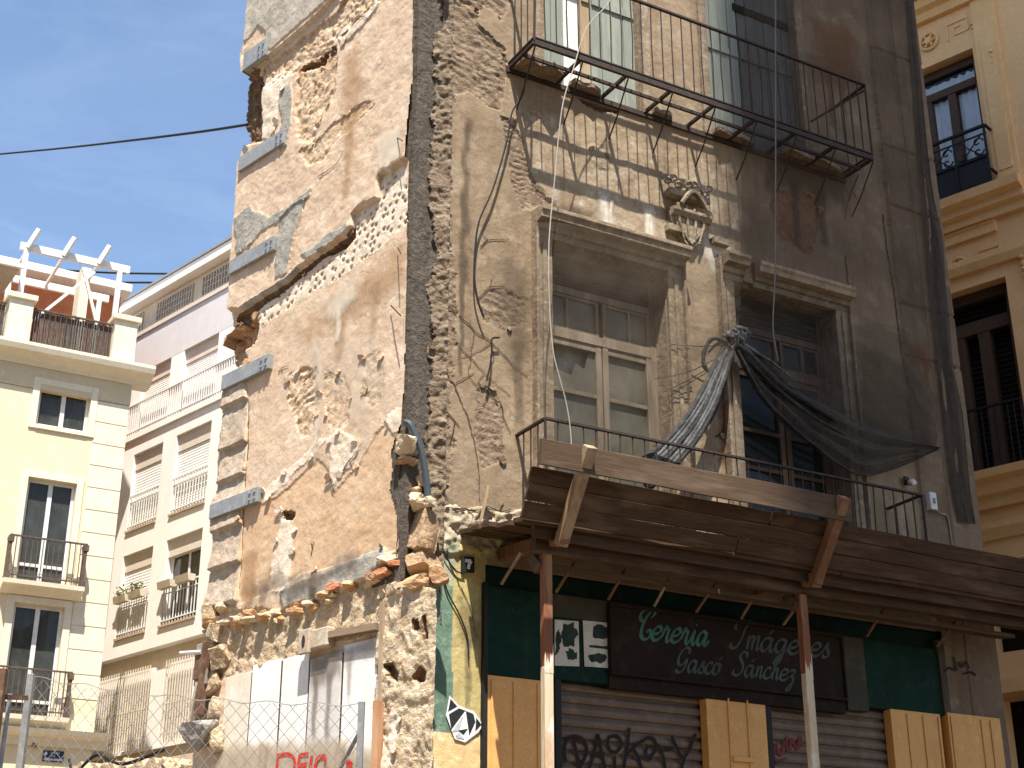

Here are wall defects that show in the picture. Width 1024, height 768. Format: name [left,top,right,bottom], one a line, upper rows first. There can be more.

spalling [204,0,522,677]
damp [459,123,470,372]